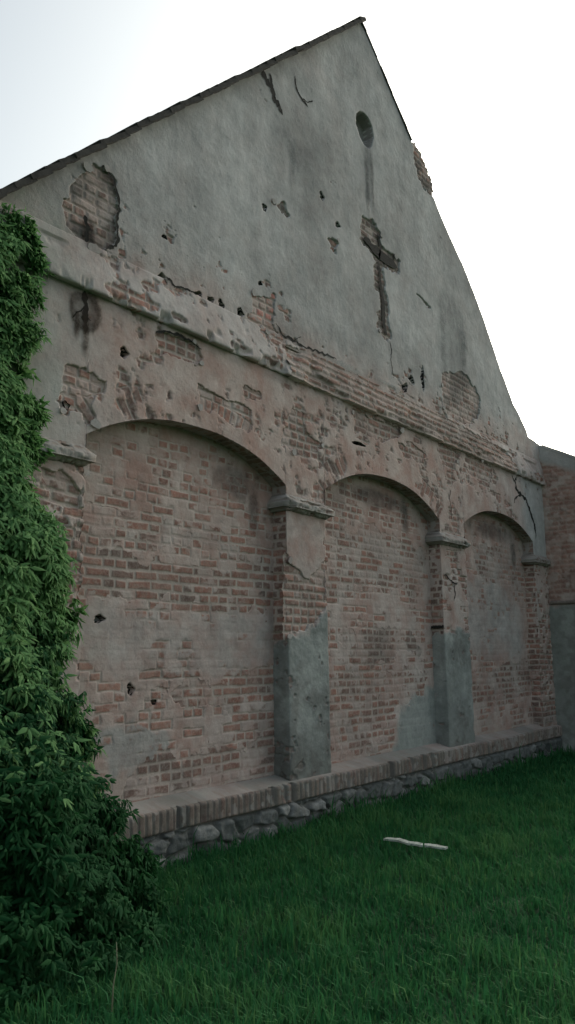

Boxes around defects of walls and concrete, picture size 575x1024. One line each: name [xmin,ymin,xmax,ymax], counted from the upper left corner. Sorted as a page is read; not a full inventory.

crack [261,70,313,115]
spalling [412,142,433,196]
flaking render [62,162,118,254]
flaking render [360,218,399,340]
flaking render [197,281,276,335]
flaking render [155,328,204,367]
crack [277,325,337,360]
flaking render [57,365,105,429]
flaking render [197,385,261,433]
peeling [441,371,479,424]
crack [512,476,536,533]